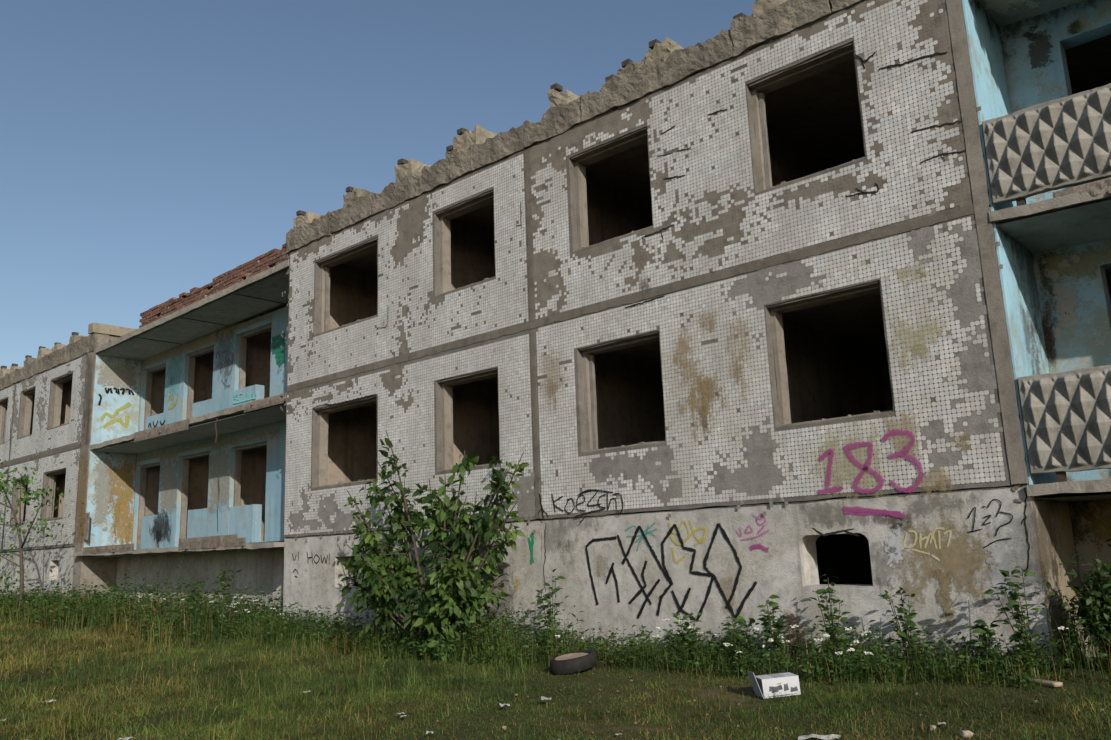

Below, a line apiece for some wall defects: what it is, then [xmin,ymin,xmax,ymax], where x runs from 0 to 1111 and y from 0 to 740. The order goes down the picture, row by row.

crack [855,52,947,71]
peeling [1023,24,1055,71]
crack [911,120,966,163]
peeling [519,57,892,332]
crack [845,183,879,197]
peeling [770,0,1004,490]
peeling [244,188,445,422]
peeling [582,416,798,518]
peeling [287,483,367,544]